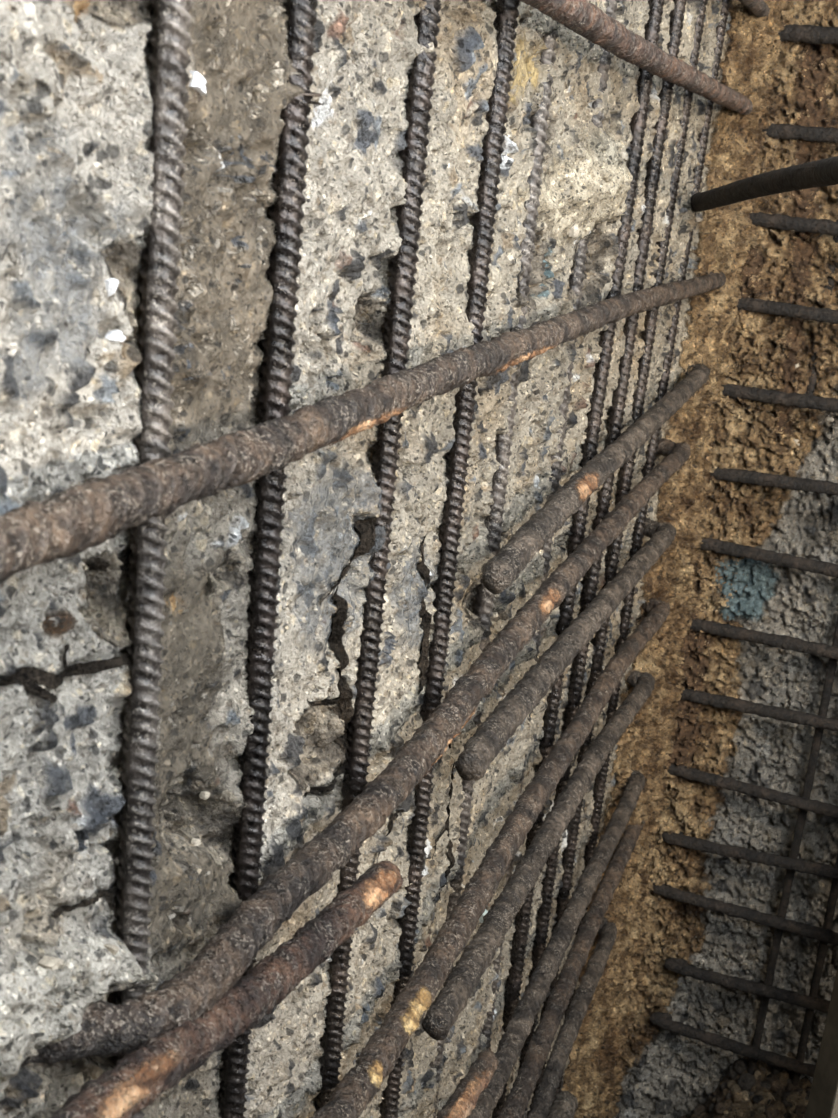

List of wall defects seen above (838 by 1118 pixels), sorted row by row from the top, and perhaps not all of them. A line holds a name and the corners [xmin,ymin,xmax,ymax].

corrosion [510,39,549,100]
spalling [519,0,838,292]
spalling [0,0,726,902]
crack [0,644,131,703]
crack [304,517,377,798]
spalling [0,362,710,1118]